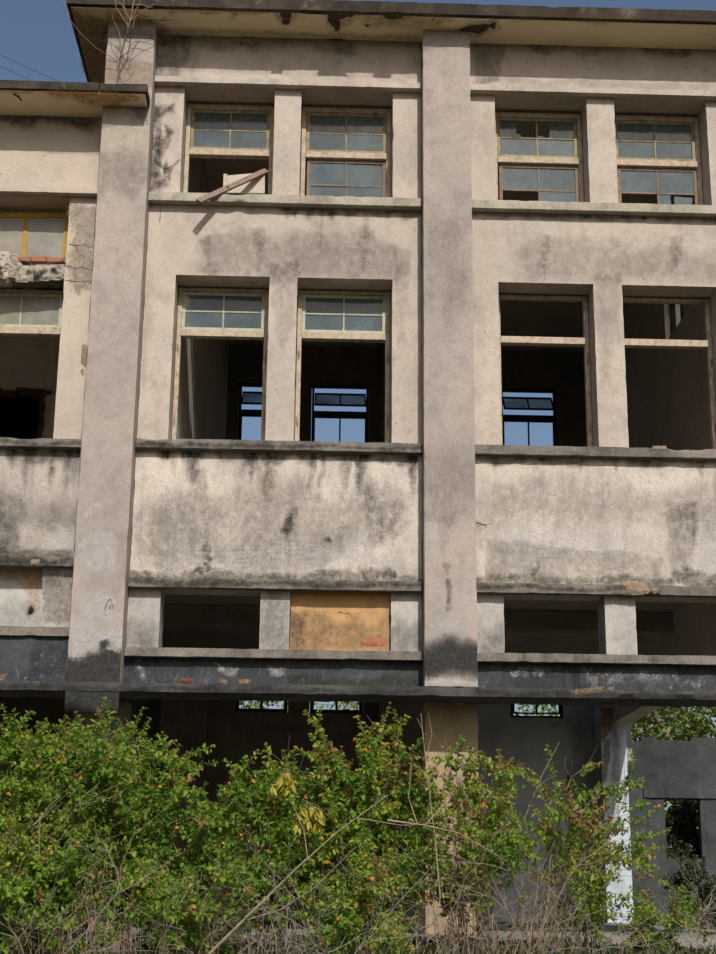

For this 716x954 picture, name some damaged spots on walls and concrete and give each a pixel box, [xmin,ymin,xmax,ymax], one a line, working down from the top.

spalling [280,10,292,25]
spalling [328,10,359,31]
spalling [384,12,403,20]
spalling [459,22,496,34]
mould [150,106,173,190]
spalling [0,253,66,282]
damp [425,620,715,699]